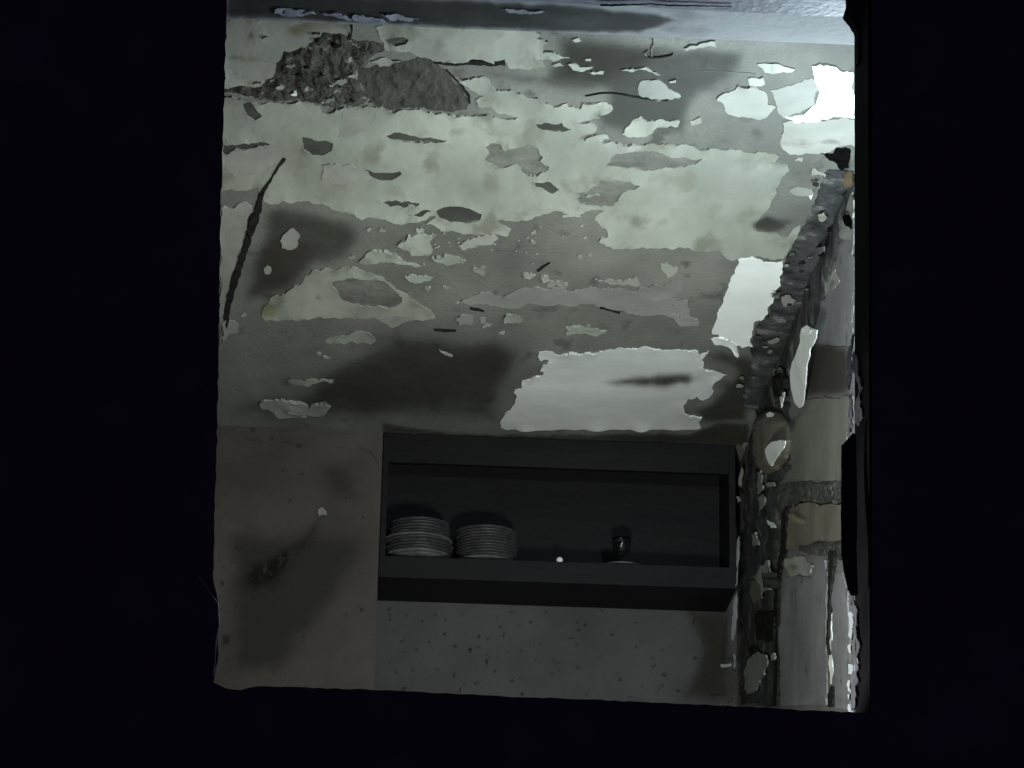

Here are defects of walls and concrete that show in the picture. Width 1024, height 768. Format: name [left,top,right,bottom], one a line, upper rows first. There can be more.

crack [223,157,286,328]
peeling [219,0,863,712]
damp [623,377,689,386]